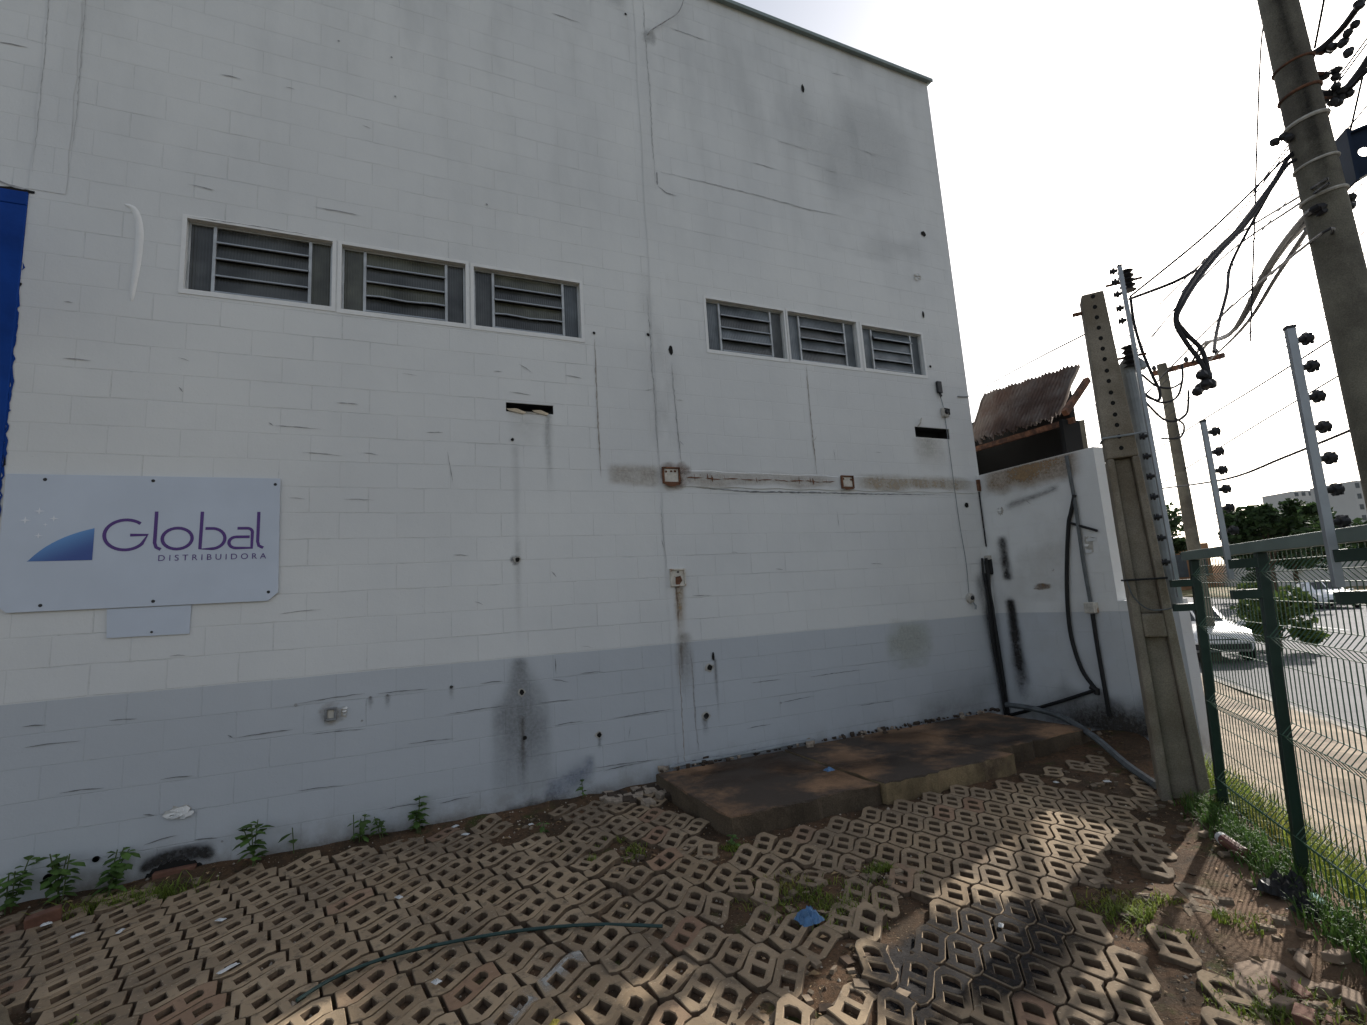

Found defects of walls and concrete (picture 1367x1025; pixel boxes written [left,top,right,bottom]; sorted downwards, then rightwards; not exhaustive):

corrosion [670,466,835,487]
corrosion [868,478,958,490]